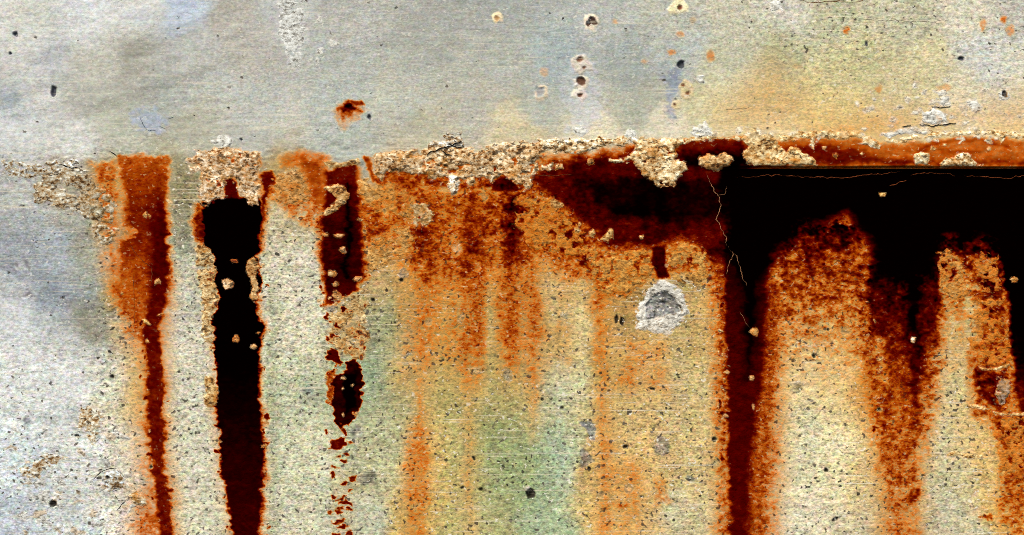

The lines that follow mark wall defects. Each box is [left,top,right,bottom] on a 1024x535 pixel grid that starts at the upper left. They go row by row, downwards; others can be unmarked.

spalling [0,157,139,250]
rust [84,150,189,535]
rust [330,98,370,133]
spalling [180,74,1024,258]
rust [189,131,1024,535]
peeling [645,241,711,320]